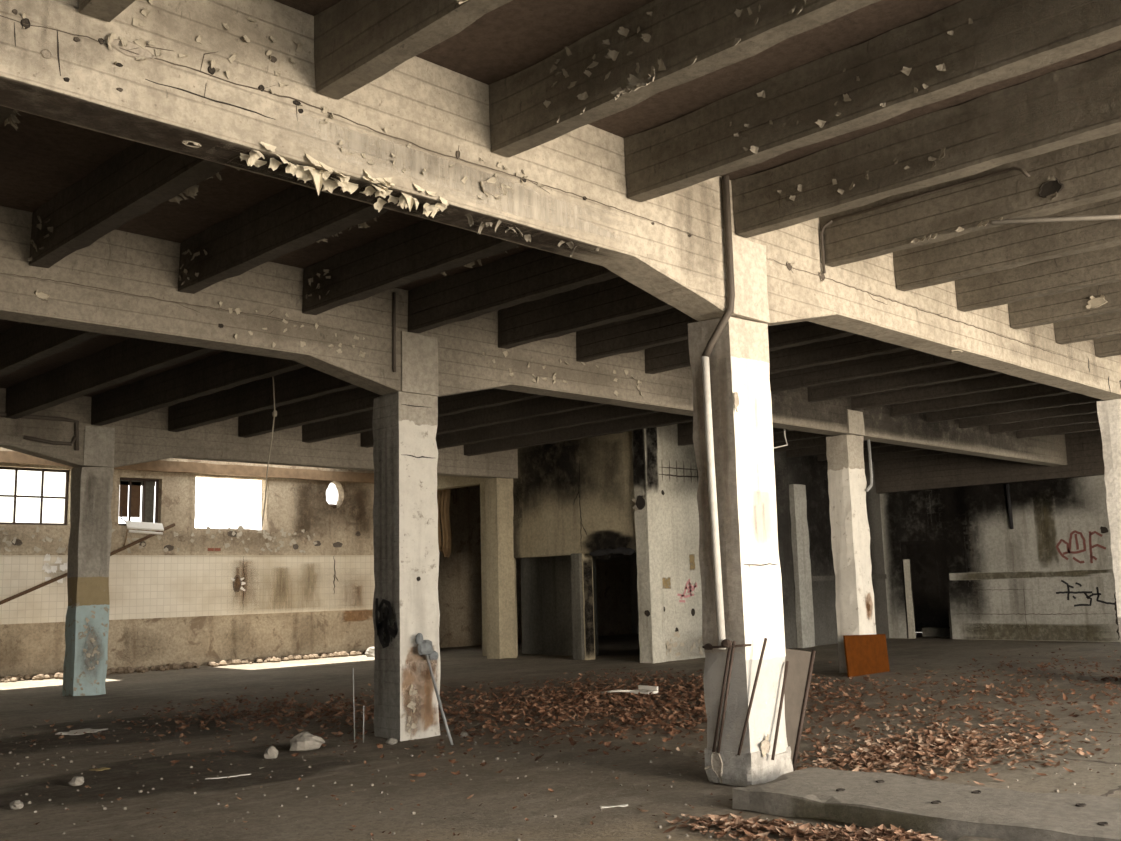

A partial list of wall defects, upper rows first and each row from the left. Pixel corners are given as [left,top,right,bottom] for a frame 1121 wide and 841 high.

peeling [543,27,666,115]
peeling [169,140,449,243]
spalling [1038,175,1064,200]
damp [942,479,1108,580]
damp [966,624,1108,641]
corrosion [402,647,437,733]